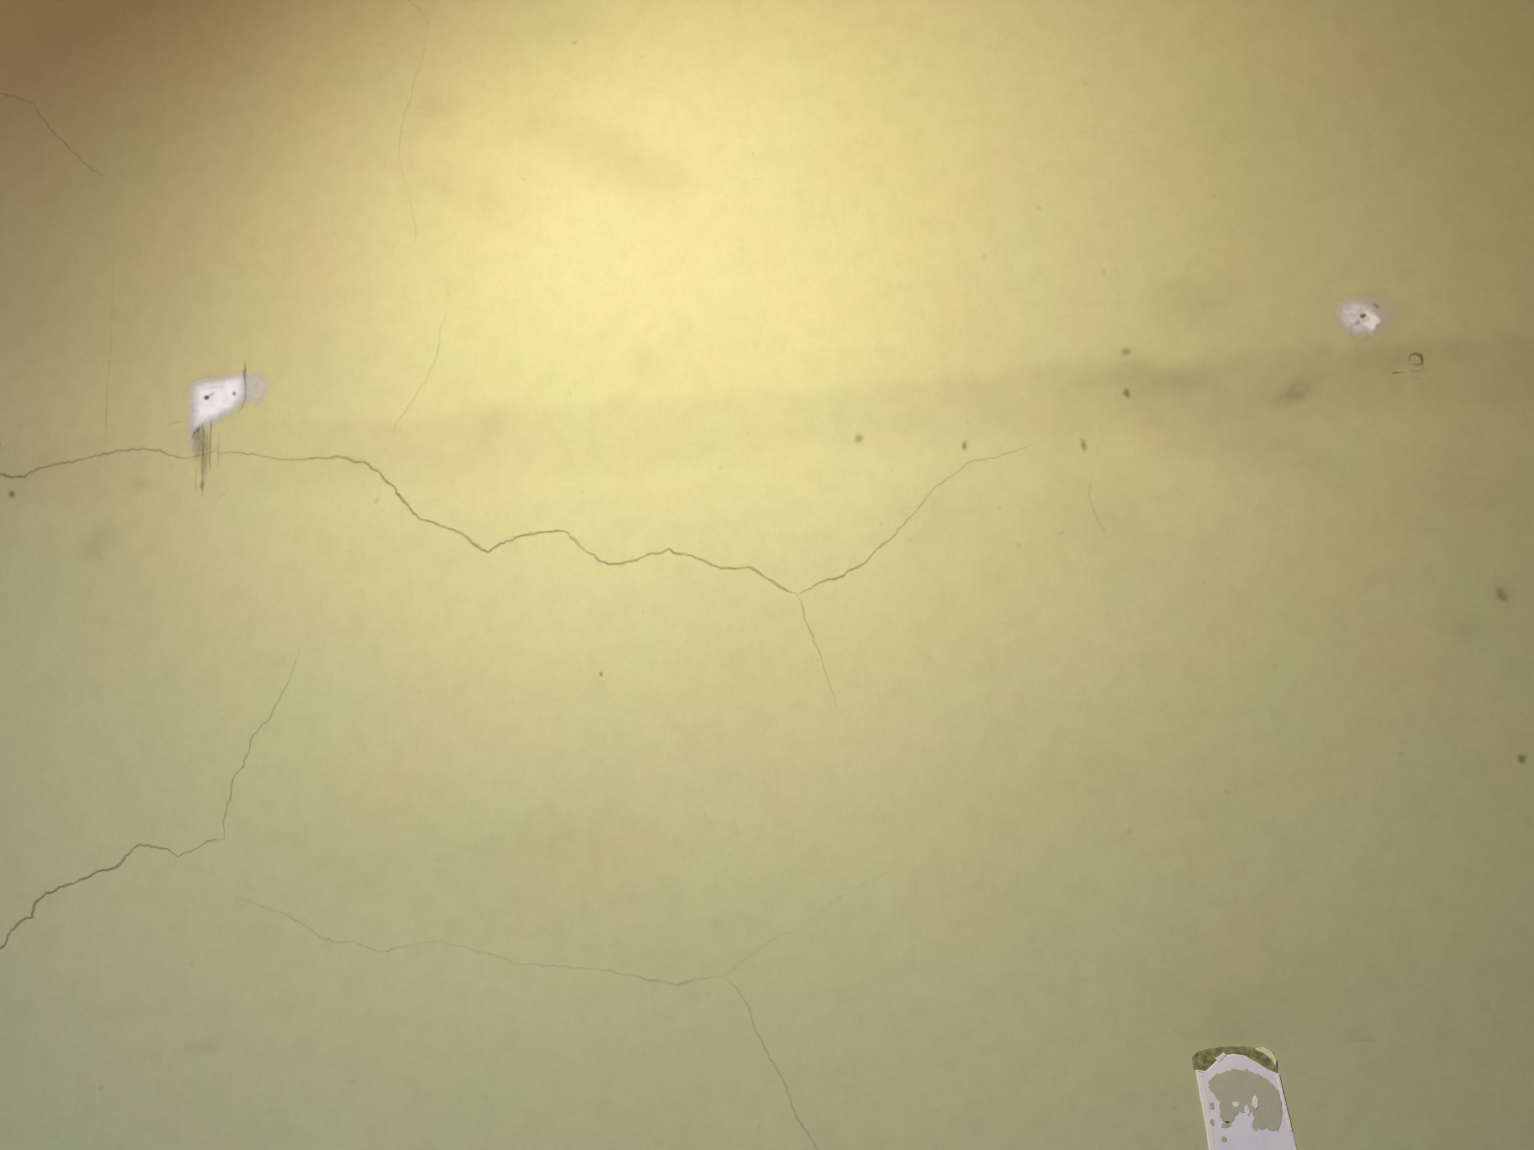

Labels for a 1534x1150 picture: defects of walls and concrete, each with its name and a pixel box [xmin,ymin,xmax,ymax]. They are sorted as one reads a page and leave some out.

peeling [1255,1047,1277,1066]
peeling [1233,1095,1258,1115]